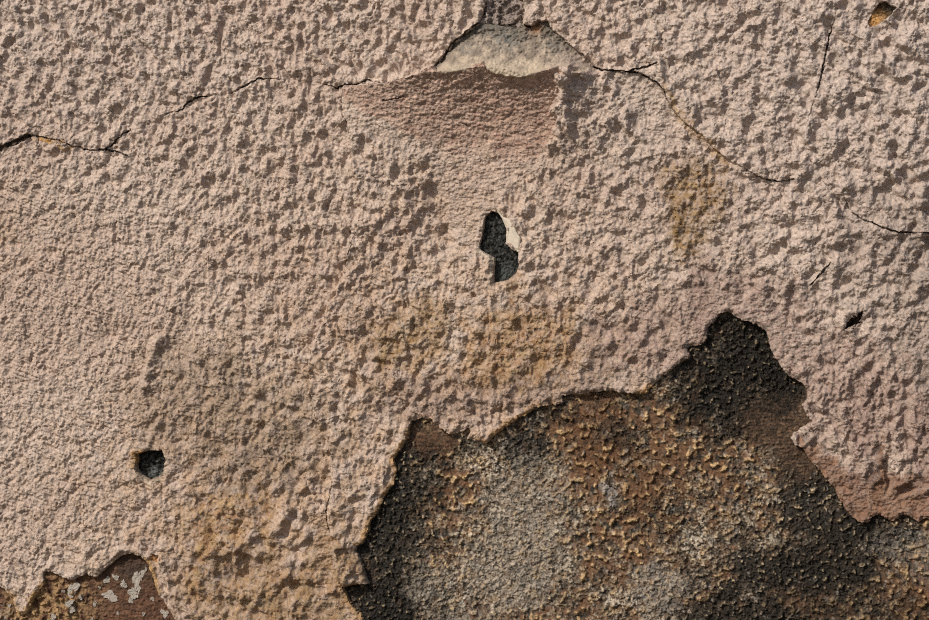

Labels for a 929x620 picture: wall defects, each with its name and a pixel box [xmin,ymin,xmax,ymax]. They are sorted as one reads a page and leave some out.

crack [382,0,530,100]
spalling [432,0,595,79]
crack [594,63,669,102]
spalling [868,2,896,27]
crack [0,131,129,157]
spalling [477,210,521,282]
spalling [130,449,167,485]
peeling [345,312,929,620]
peeling [0,554,175,620]